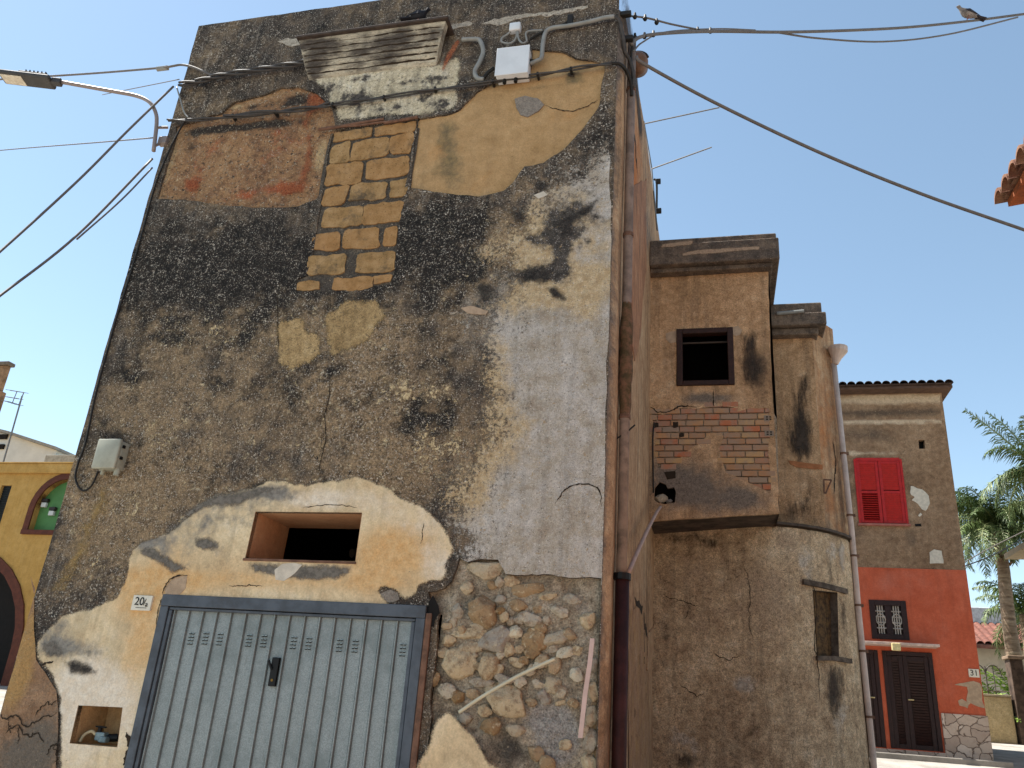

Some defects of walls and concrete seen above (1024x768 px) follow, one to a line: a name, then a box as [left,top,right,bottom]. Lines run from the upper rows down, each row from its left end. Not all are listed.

damp [477,284,494,300]
damp [522,269,566,300]
damp [743,336,760,386]
crack [319,375,330,469]
damp [787,378,811,459]
flaking render [649,402,823,493]
crack [557,483,602,506]
damp [829,669,844,715]
peeling [955,681,985,708]
crack [0,700,59,762]
peeling [418,713,495,768]